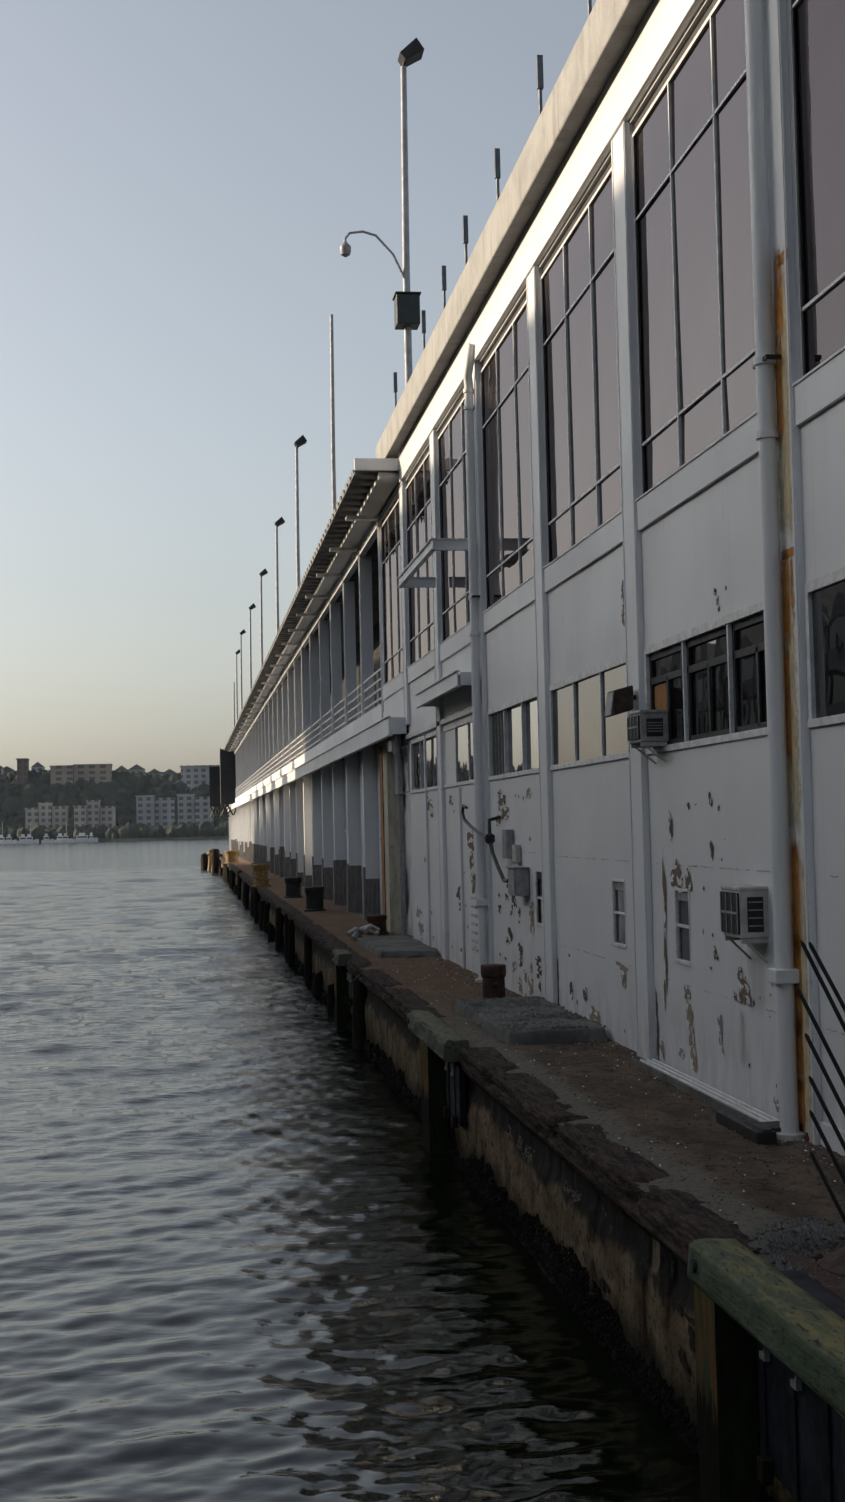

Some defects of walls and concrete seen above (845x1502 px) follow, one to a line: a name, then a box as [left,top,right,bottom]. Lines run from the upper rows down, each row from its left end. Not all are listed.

rust [774,249,787,437]
rust [782,547,794,757]
spalling [414,741,455,817]
peeling [496,788,531,826]
peeling [668,792,719,840]
peeling [456,829,475,929]
peeling [498,881,542,997]
peeling [659,857,704,1073]
peeling [733,967,773,1017]
rust [791,844,810,1142]
damp [634,1229,674,1344]